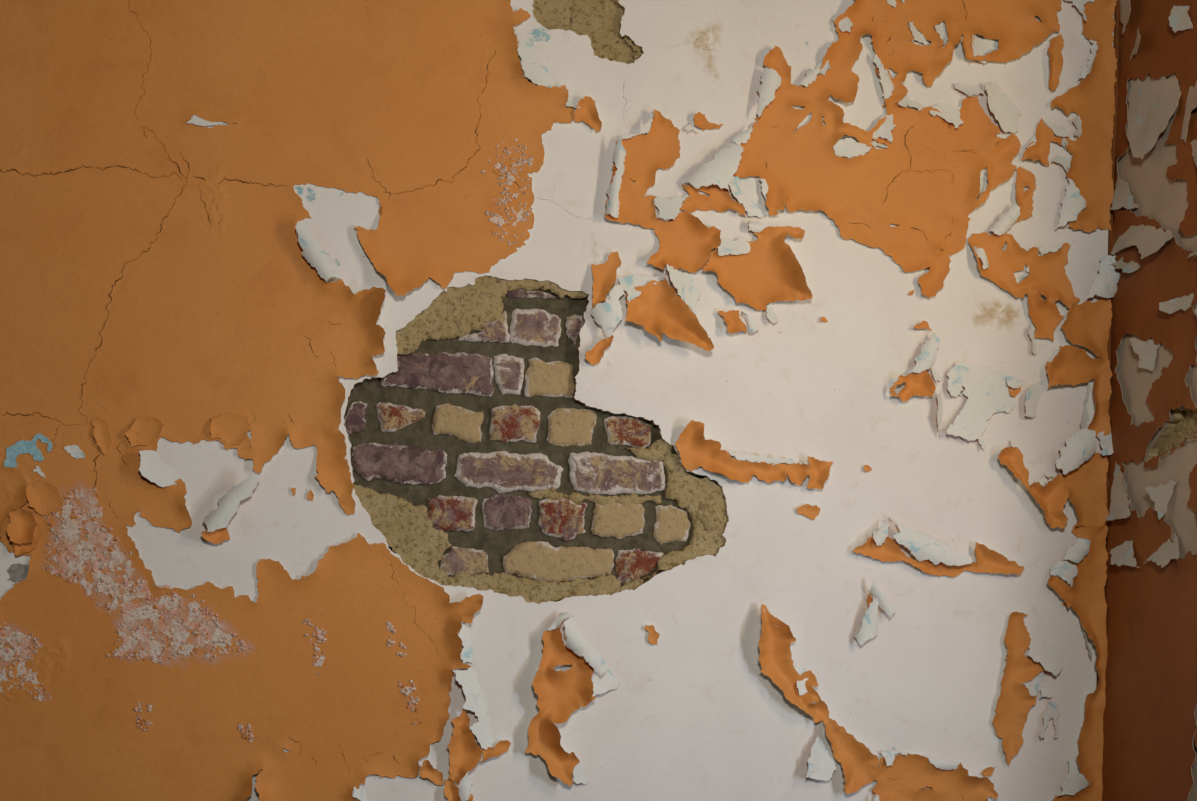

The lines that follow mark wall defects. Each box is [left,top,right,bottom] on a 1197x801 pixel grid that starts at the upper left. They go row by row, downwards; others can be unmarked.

peeling [187,115,227,128]
peeling [1120,98,1197,251]
crack [0,0,290,520]
peeling [0,466,64,600]
peeling [64,445,85,459]
damp [42,486,252,663]
spalling [125,183,729,604]
peeling [352,0,1120,801]
peeling [1120,334,1173,425]
peeling [1124,438,1197,558]
damp [0,622,52,701]
peeling [303,619,327,675]